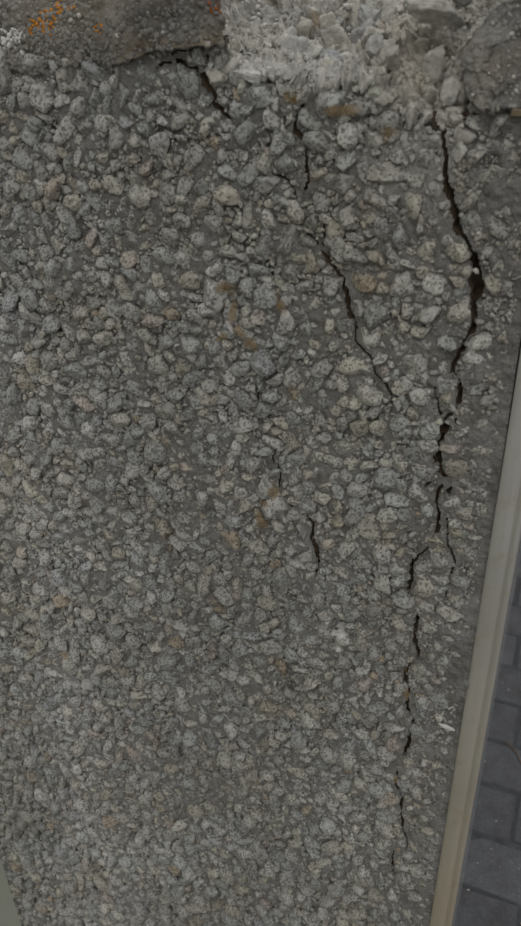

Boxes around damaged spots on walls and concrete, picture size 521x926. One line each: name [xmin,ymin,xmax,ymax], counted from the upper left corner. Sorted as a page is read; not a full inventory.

crack [158,35,231,119]
spalling [220,0,503,144]
crack [272,103,310,198]
crack [306,223,393,403]
crack [407,110,485,595]
crack [307,514,320,571]
crack [391,613,420,870]